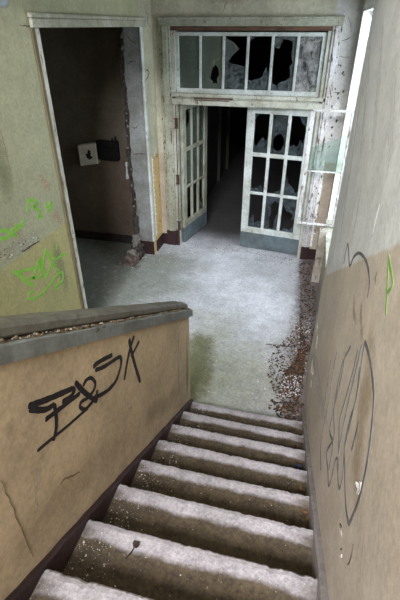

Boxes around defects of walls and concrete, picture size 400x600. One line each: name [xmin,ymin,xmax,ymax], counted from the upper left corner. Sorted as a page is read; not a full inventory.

spalling [117,27,146,269]
peeling [304,88,344,247]
crack [1,481,33,557]